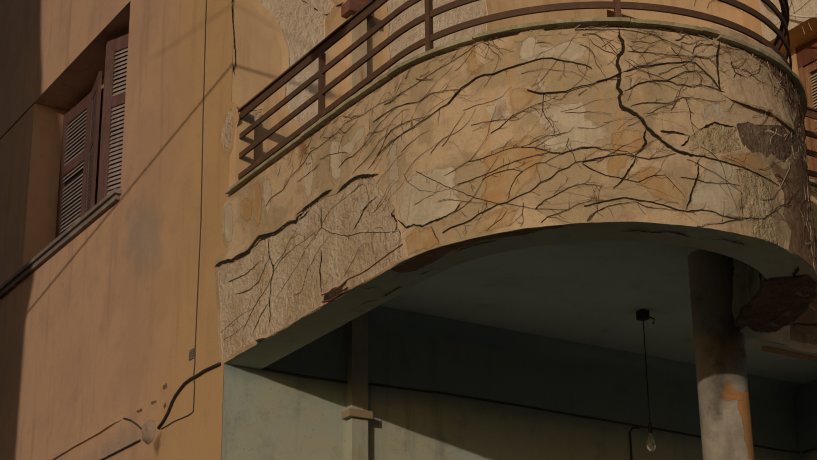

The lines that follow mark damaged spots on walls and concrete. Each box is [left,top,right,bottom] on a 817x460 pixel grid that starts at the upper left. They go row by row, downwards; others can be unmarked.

flaking render [250,0,340,75]
flaking render [381,0,492,83]
crack [614,29,734,211]
crack [214,164,380,334]
crack [391,204,500,251]
flaking render [215,25,817,364]
peeling [720,381,754,460]